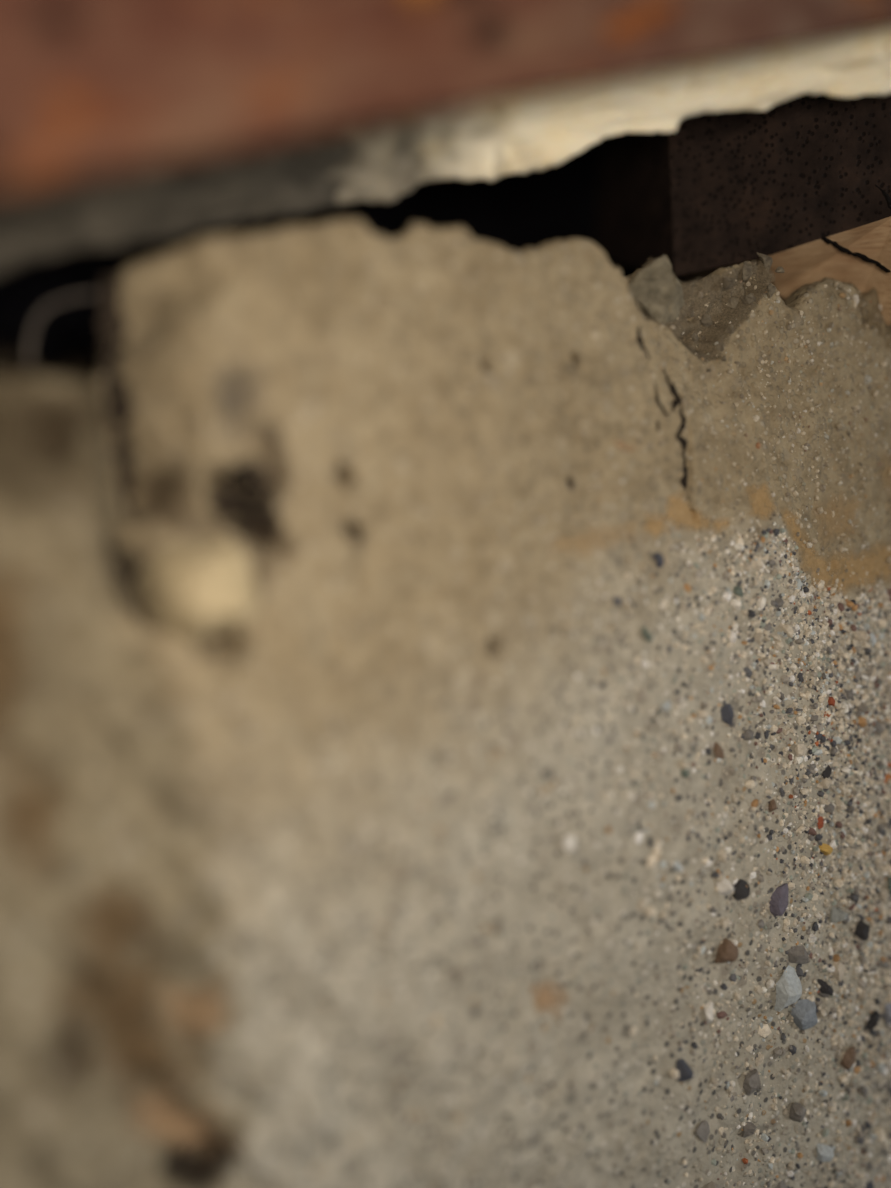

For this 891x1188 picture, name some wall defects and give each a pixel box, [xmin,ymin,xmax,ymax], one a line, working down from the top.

spalling [635,252,785,372]
crack [636,326,701,530]